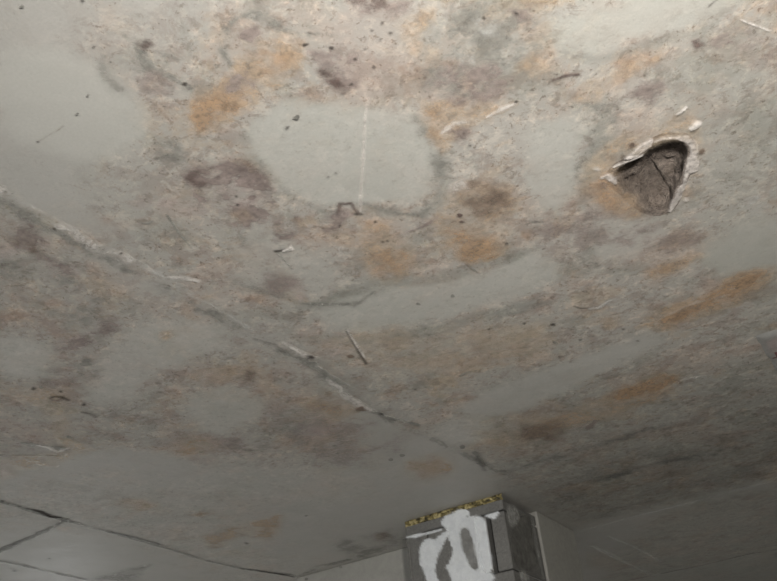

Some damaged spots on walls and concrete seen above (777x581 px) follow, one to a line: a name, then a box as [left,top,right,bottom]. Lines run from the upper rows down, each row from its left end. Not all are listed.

crack [5,191,133,273]
damp [183,161,278,228]
damp [324,203,361,231]
spalling [601,123,705,216]
crack [198,309,223,322]
crack [278,347,492,469]
crack [0,501,81,569]
crack [103,530,293,577]